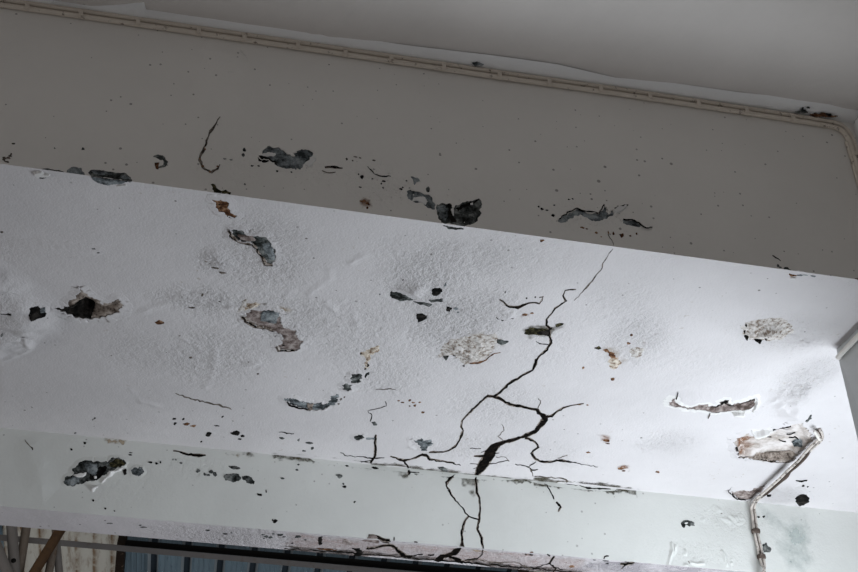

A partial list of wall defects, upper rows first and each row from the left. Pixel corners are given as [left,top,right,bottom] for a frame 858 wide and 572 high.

crack [198,117,220,173]
peeling [242,144,317,174]
peeling [205,184,286,270]
peeling [399,176,482,230]
spalling [40,285,133,323]
peeling [236,299,313,354]
peeling [277,371,369,412]
crack [336,234,614,566]
peeling [662,387,766,419]
peeling [726,419,824,465]
peeling [60,448,161,502]
crack [533,554,635,572]